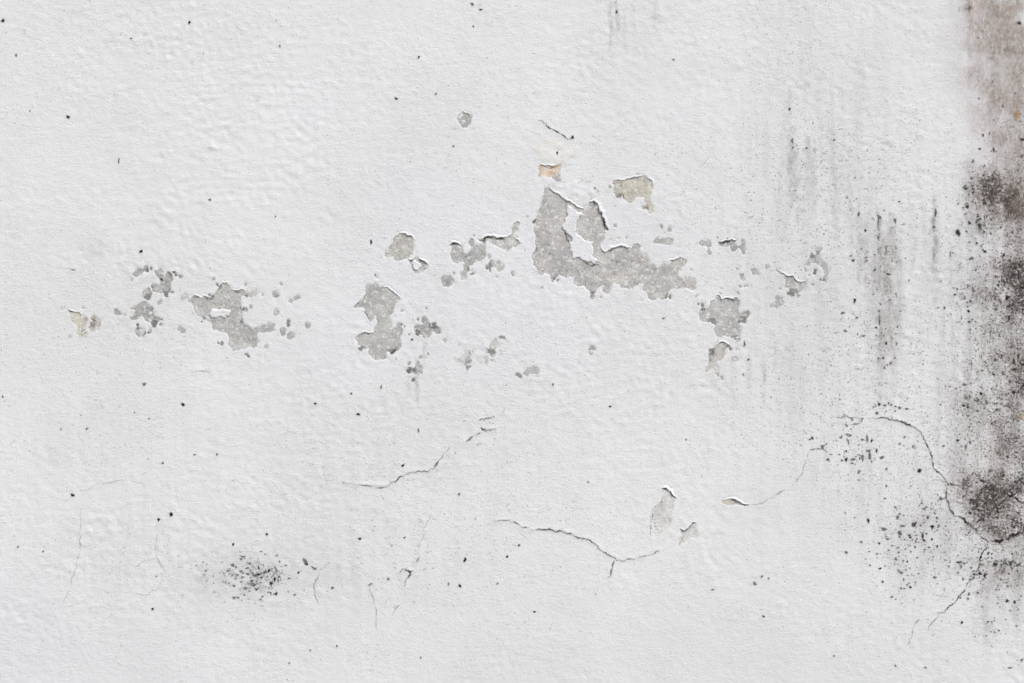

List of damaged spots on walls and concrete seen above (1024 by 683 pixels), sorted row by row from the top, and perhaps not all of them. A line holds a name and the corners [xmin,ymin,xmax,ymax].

damp [966,0,1024,109]
peeling [60,306,101,339]
peeling [114,265,311,358]
peeling [385,231,429,274]
peeling [352,274,508,382]
peeling [441,163,830,380]
damp [841,132,1024,634]
damp [801,414,887,475]
peeling [650,485,698,545]
crack [850,417,1022,626]
damp [195,543,296,604]